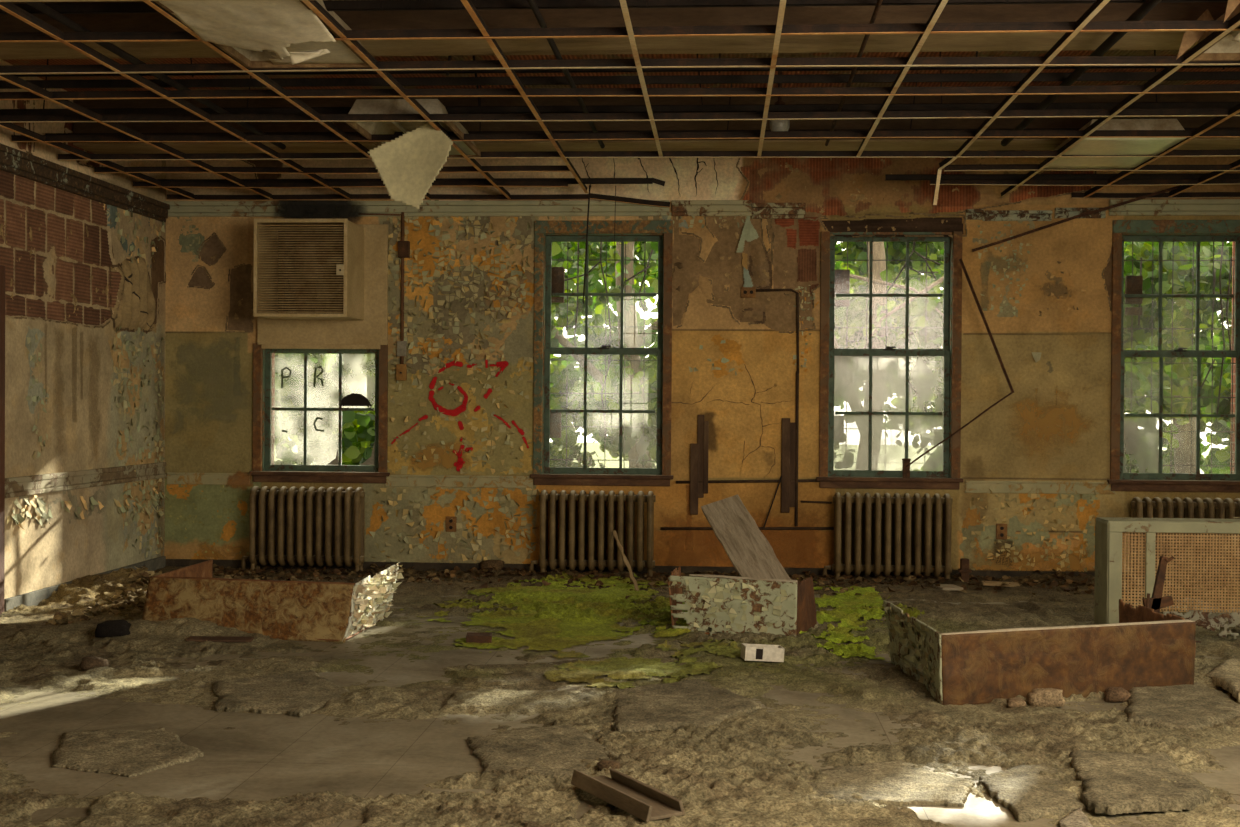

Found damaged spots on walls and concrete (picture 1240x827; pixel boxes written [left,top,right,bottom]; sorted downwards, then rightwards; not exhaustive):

flaking render [0,170,253,561]
peeling [349,214,572,635]
crack [671,364,792,477]
flaking render [639,158,1096,378]
peeling [959,486,1100,572]
flaking render [1101,248,1112,312]